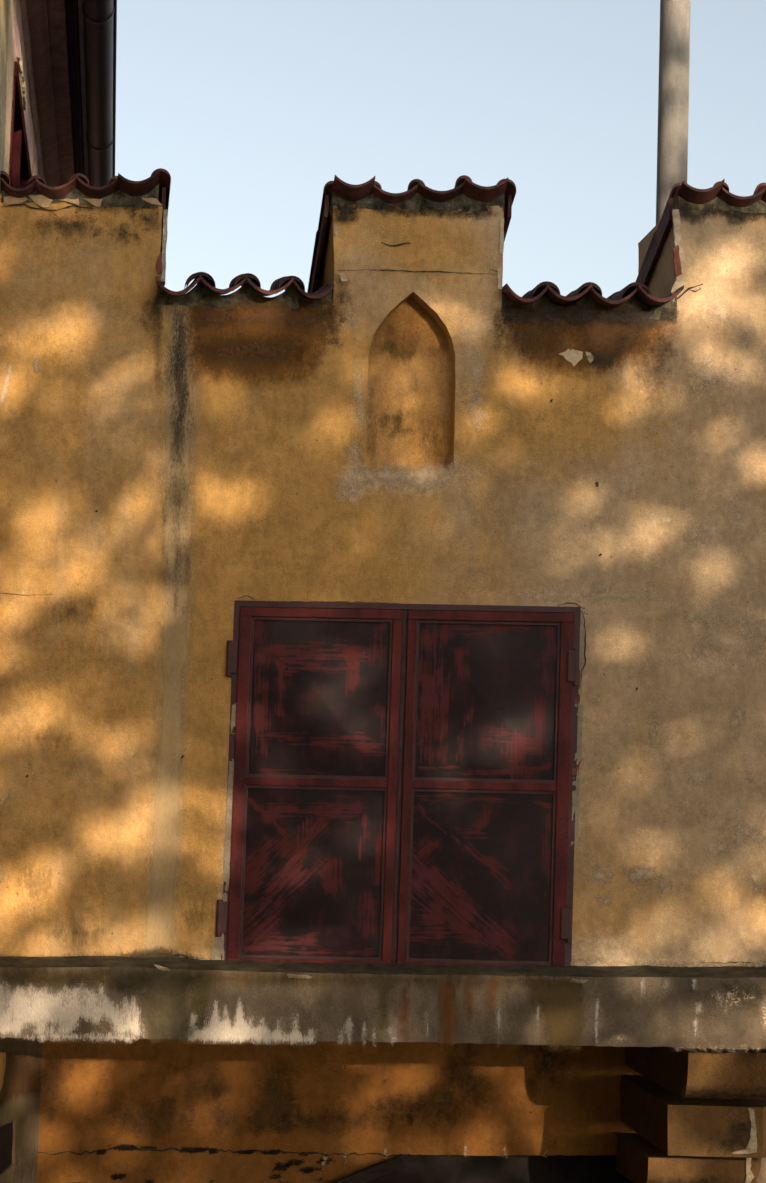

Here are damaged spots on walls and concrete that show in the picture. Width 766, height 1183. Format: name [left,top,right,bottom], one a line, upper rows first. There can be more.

peeling [559,349,594,366]
damp [504,306,676,384]
damp [146,301,331,952]
crack [38,1144,405,1157]